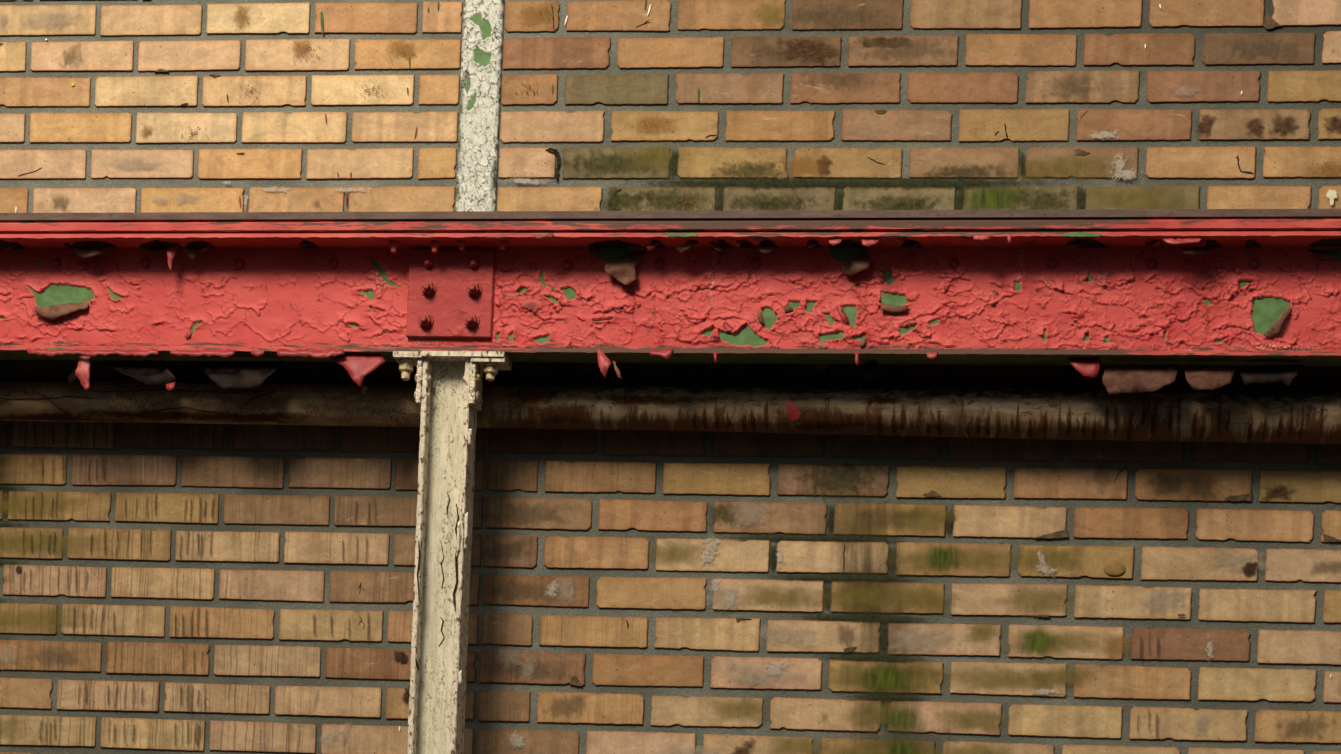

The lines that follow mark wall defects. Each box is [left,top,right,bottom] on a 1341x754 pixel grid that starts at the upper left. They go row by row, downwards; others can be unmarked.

peeling [29,284,123,320]
peeling [26,321,385,395]
peeling [701,301,867,366]
peeling [806,238,940,335]
peeling [1068,332,1304,394]
peeling [1238,280,1292,337]
corrosion [610,395,768,432]
corrosion [797,398,941,435]
corrosion [967,400,1230,440]
leakage [945,510,953,532]
crack [415,493,459,669]
leakage [700,465,923,662]